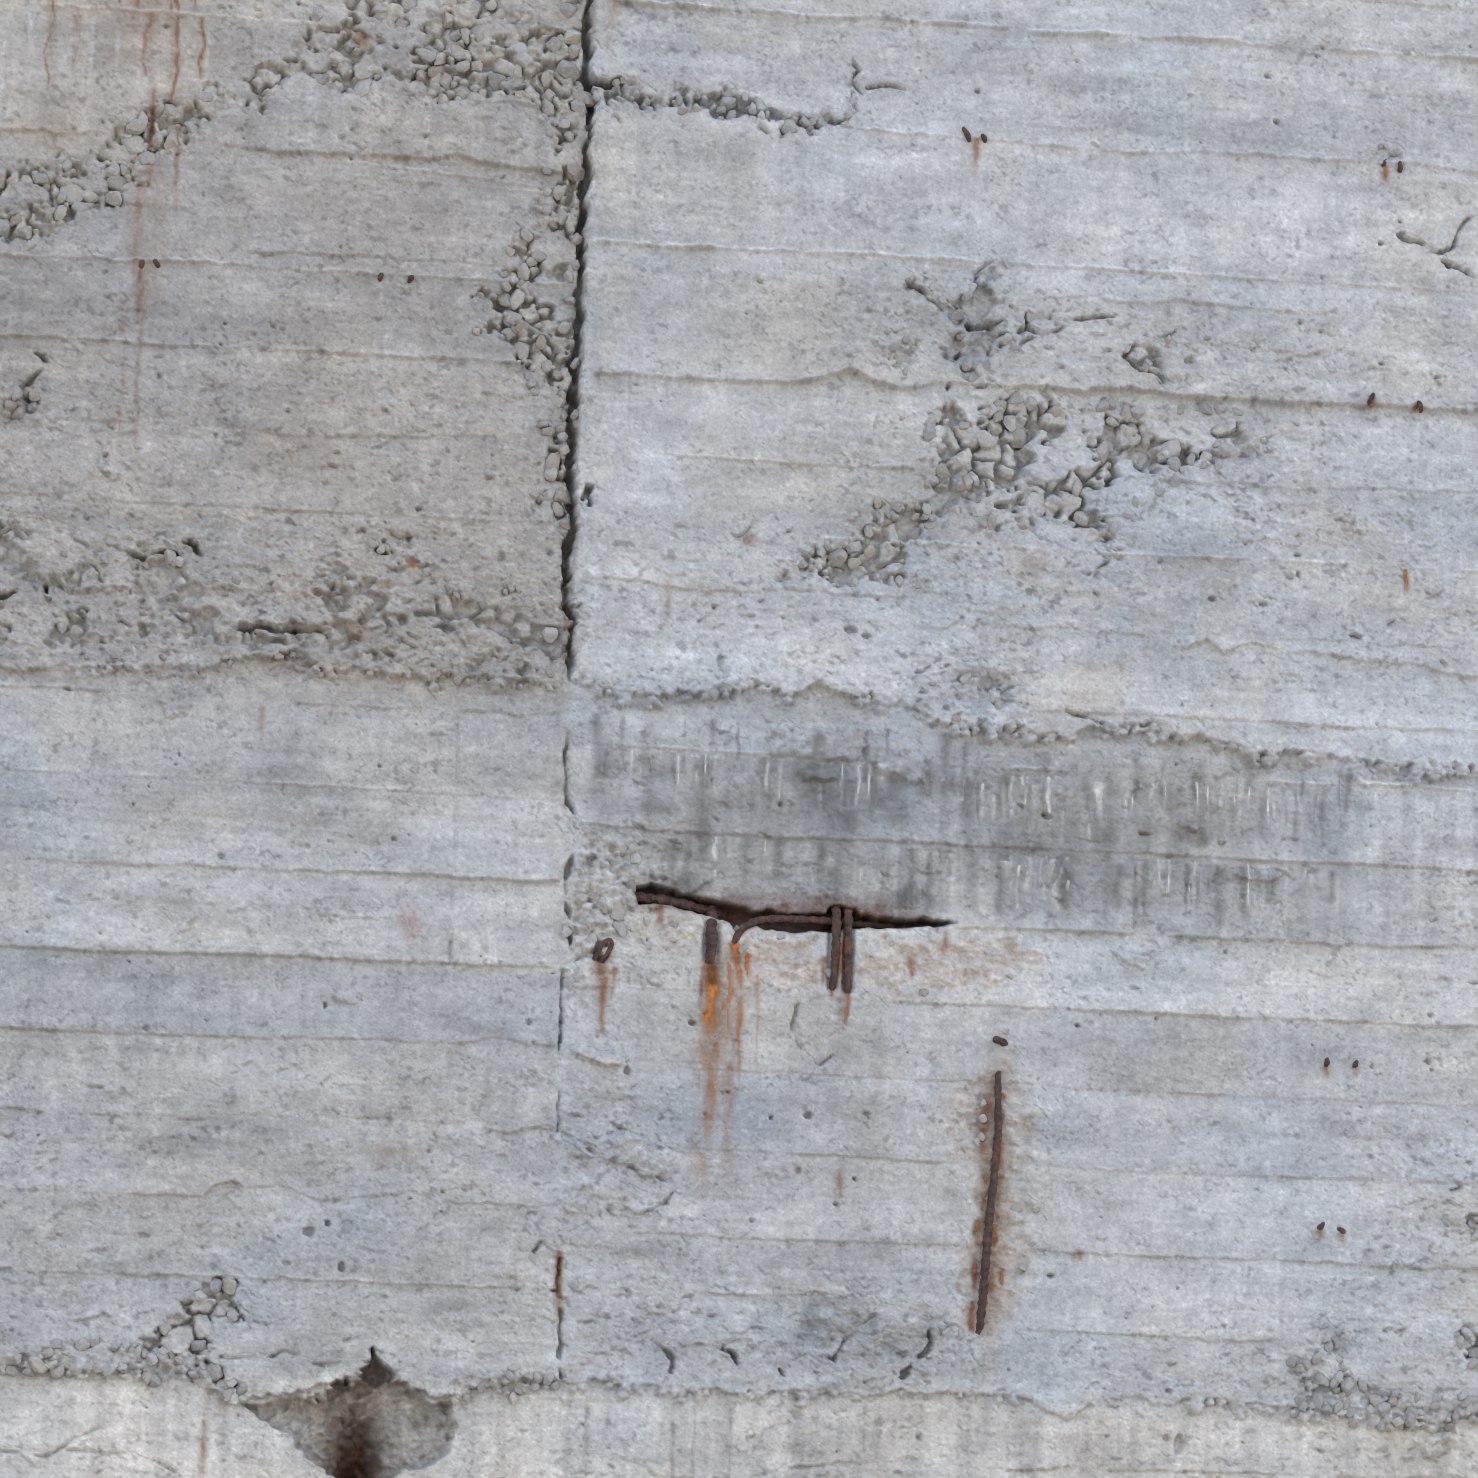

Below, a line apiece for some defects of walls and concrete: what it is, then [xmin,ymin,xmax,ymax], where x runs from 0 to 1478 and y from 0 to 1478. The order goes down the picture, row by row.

crack [1396,214,1478,282]
spalling [561,826,832,998]
corrosion [597,958,616,1022]
corrosion [703,943,749,1047]
corrosion [822,914,850,1021]
spalling [850,926,1051,1009]
spalling [780,1045,1051,1387]
corrosion [972,1262,1004,1288]